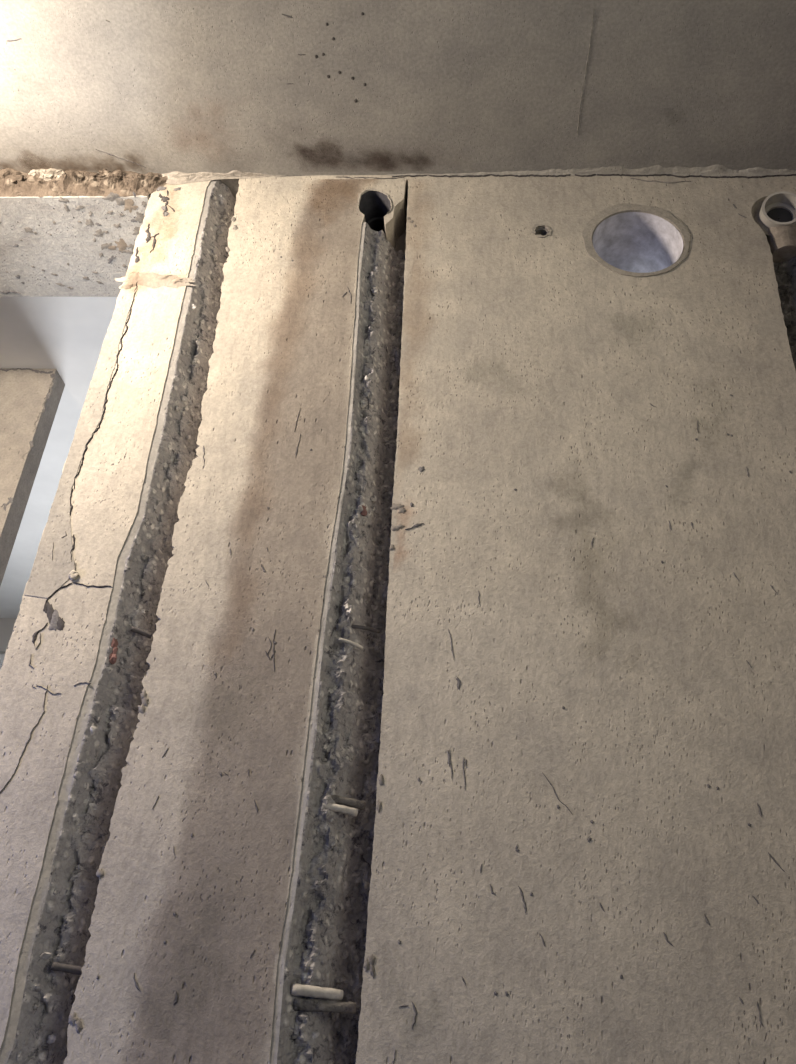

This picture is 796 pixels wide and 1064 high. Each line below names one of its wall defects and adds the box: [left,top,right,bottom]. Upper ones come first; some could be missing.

crack [339,164,796,184]
crack [0,283,137,793]